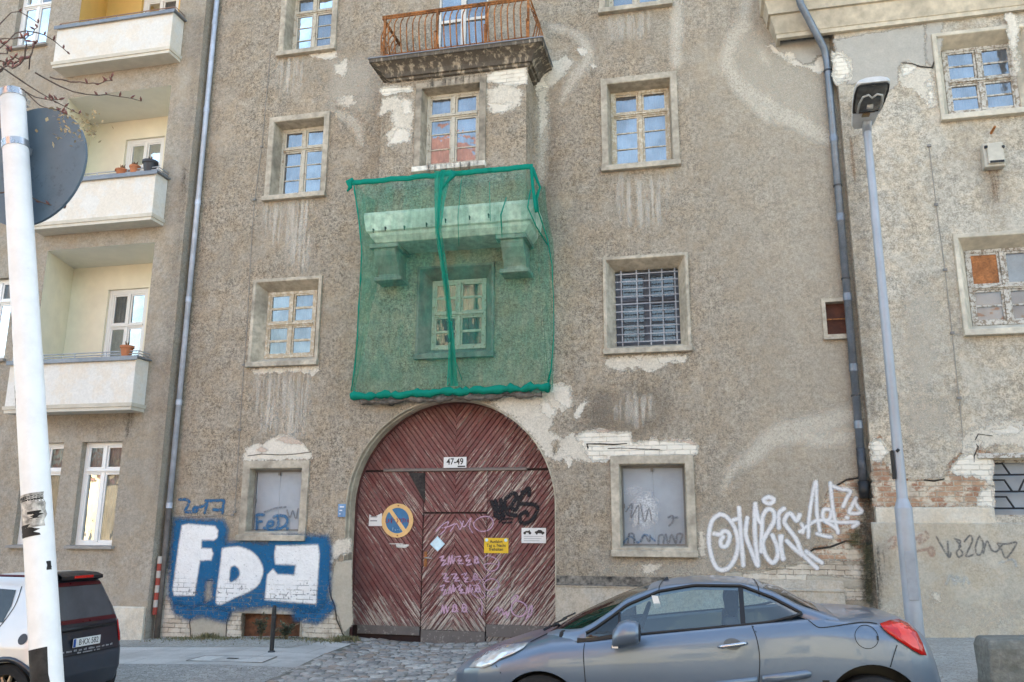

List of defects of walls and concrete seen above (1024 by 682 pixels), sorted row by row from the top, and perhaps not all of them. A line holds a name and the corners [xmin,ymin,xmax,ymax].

spalling [378,86,414,146]
spalling [486,54,576,140]
spalling [765,21,943,109]
spalling [604,352,690,372]
spalling [242,434,313,461]
spalling [491,381,699,468]
spalling [724,420,1024,601]